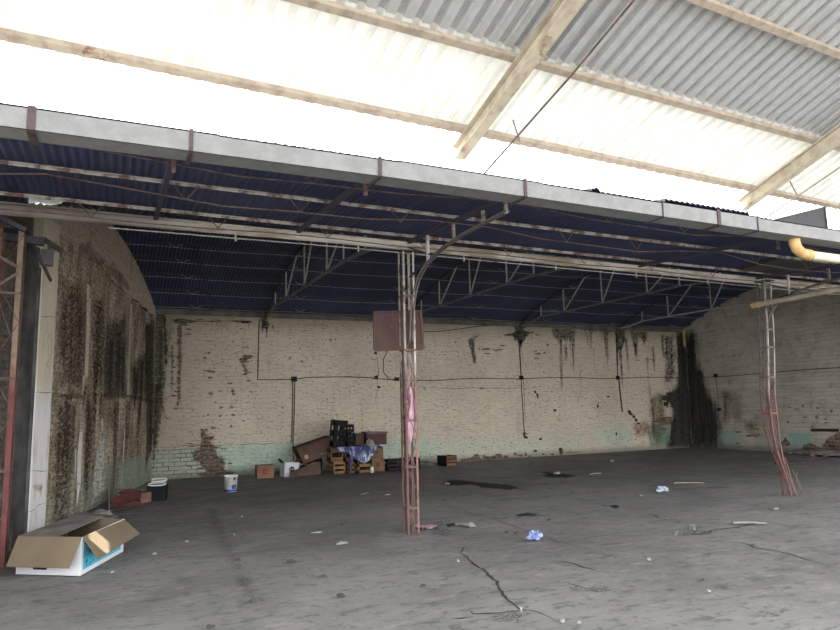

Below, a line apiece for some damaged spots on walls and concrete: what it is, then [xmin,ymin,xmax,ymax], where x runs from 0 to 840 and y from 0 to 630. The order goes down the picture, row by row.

damp [53,280,182,513]
peeling [235,347,252,381]
damp [508,327,534,348]
damp [552,328,647,386]
damp [646,330,722,448]
spalling [186,427,234,477]
crack [429,500,625,591]
crack [448,547,551,618]